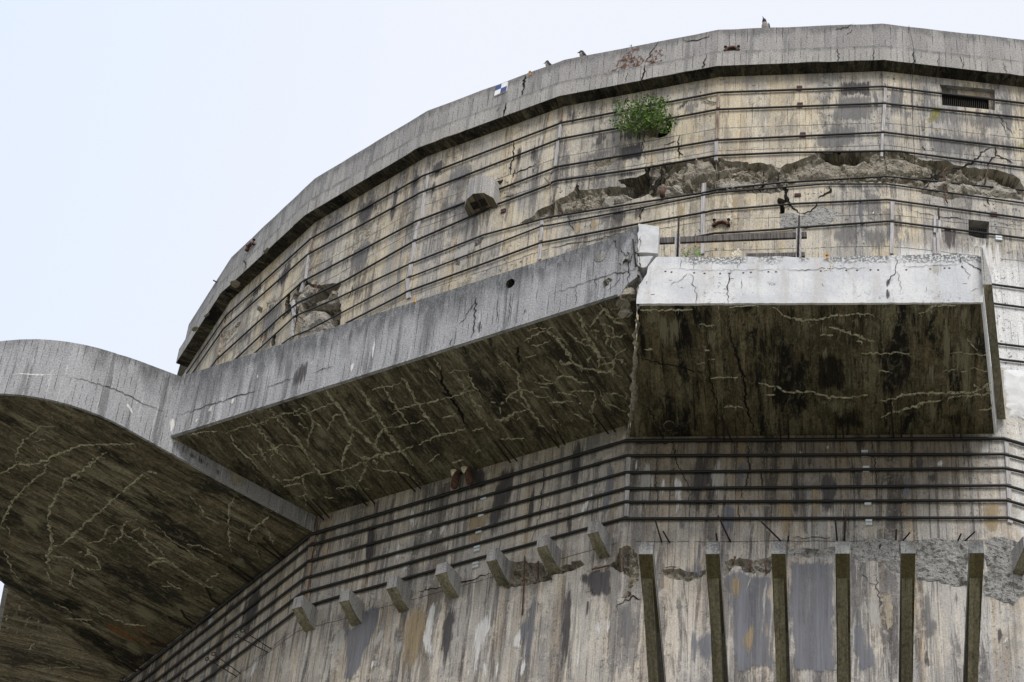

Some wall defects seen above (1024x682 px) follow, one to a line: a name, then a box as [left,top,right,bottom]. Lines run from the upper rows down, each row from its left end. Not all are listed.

leakage [815,81,1019,155]
crack [922,113,1013,178]
spalling [520,152,1024,225]
crack [185,134,993,541]
leakage [645,313,680,345]
leakage [929,308,979,383]
leakage [818,348,863,428]
crack [0,425,275,681]
spalling [501,545,640,599]
leakage [580,569,636,649]
spalling [658,568,706,582]
spalling [724,556,772,575]